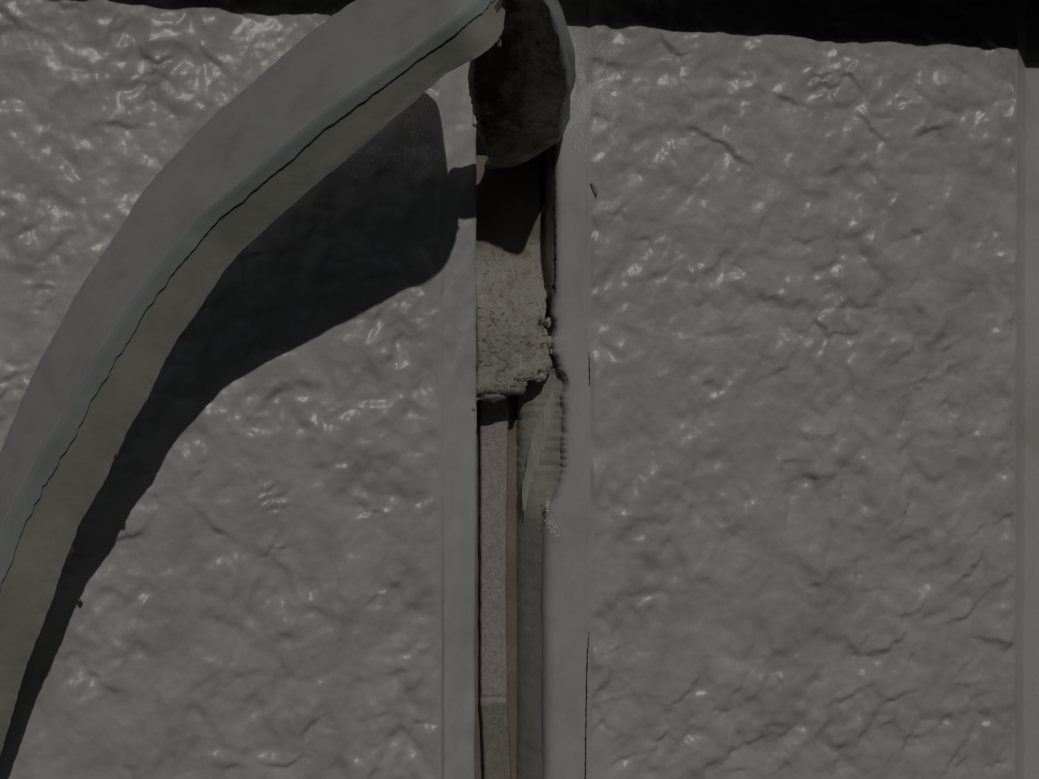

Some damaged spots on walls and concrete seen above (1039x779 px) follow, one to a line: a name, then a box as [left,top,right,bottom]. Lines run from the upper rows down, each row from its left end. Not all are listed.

peeling [0,0,576,755]
crack [550,144,558,293]